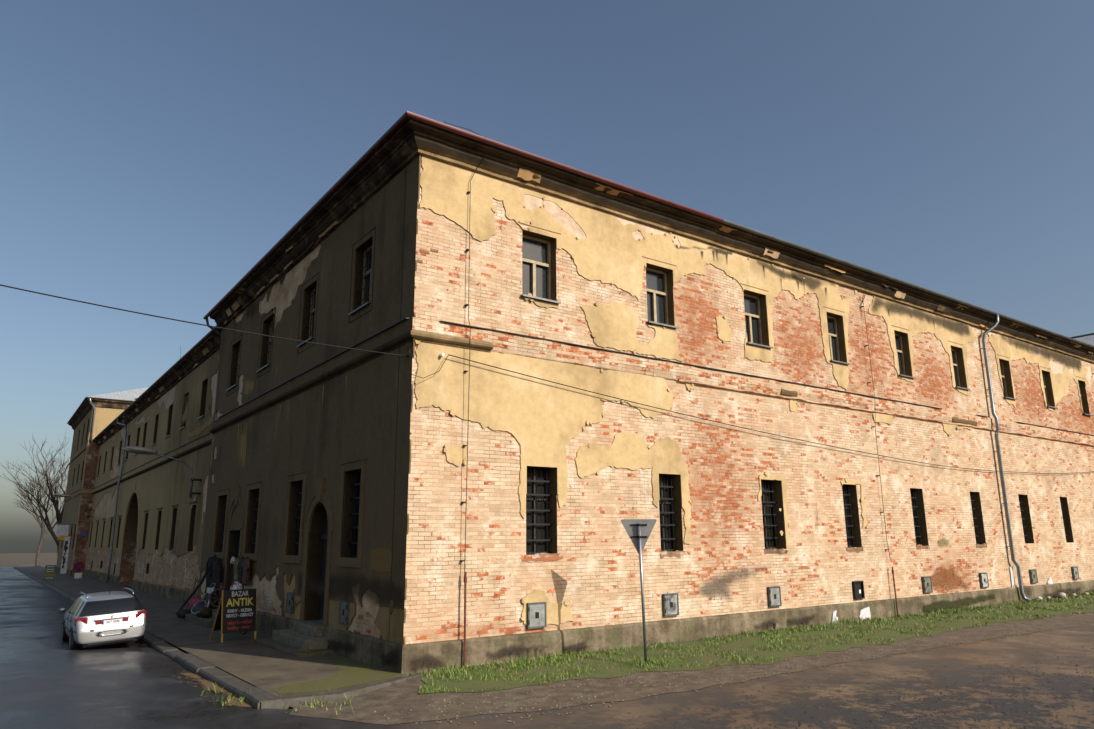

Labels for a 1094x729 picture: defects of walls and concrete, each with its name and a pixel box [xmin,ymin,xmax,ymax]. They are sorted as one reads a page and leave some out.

spalling [193,245,321,368]
peeling [419,156,857,391]
peeling [868,291,1093,413]
spalling [100,372,176,478]
spalling [207,370,222,420]
peeling [406,340,691,544]
peeling [757,471,791,551]
peeling [840,478,868,528]
spalling [134,544,212,598]
spalling [244,567,301,619]
spalling [347,592,382,640]
peeling [521,589,574,625]